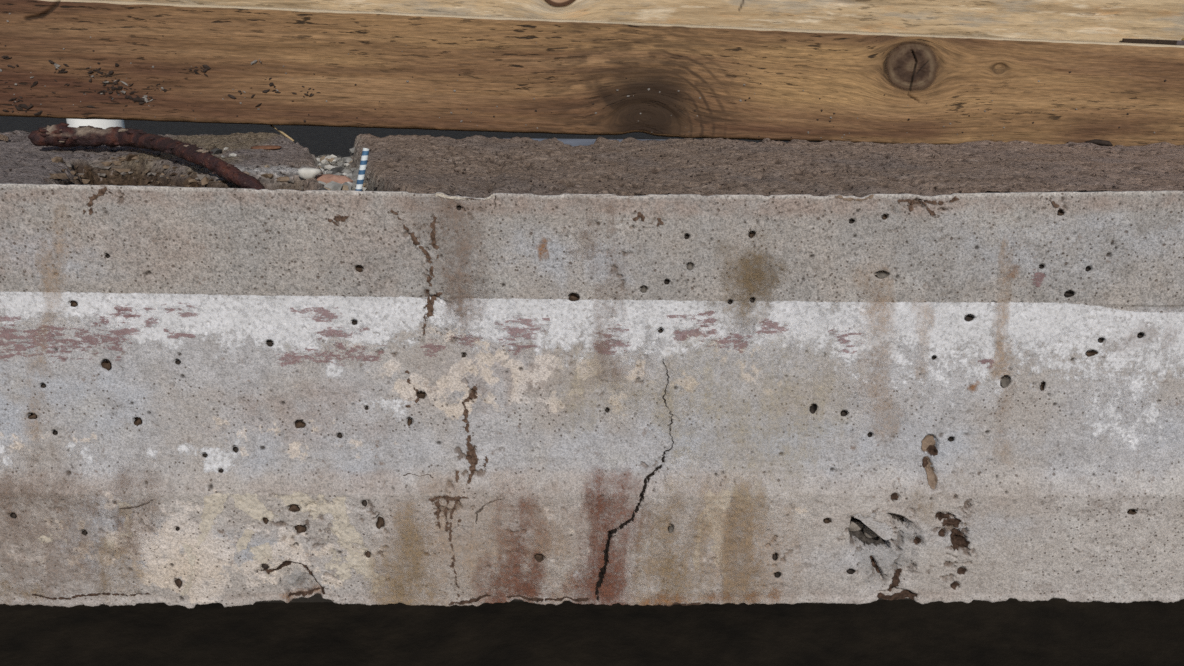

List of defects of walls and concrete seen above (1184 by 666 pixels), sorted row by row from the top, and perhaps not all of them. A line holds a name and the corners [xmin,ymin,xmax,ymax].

crack [390,209,439,259]
crack [423,292,442,335]
crack [405,370,419,408]
crack [403,384,501,597]
rust [581,476,633,602]
crack [595,359,674,601]
spalling [849,493,921,600]
spalling [936,512,970,551]